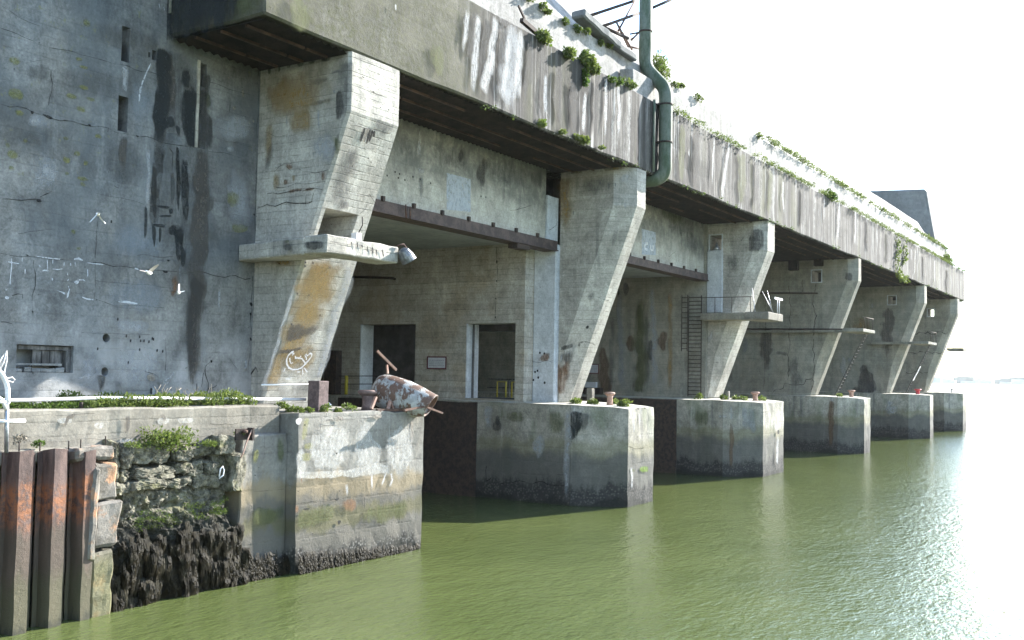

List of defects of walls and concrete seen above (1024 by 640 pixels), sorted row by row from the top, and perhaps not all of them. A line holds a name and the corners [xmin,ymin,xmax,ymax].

crack [1,12,158,127]
leakage [463,13,534,99]
leakage [544,69,620,137]
leakage [121,49,220,382]
leakage [38,256,103,298]
crack [736,280,817,391]
leakage [854,365,876,393]
leakage [552,411,588,486]